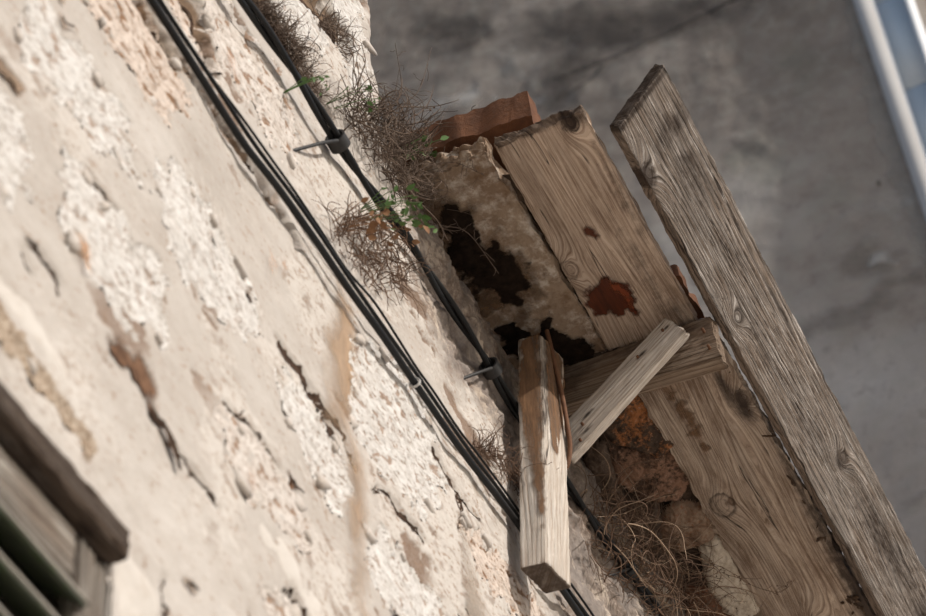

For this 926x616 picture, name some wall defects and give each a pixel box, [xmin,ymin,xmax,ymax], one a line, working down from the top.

spalling [0,87,37,212]
spalling [13,0,264,351]
peeling [0,300,98,461]
crack [149,407,217,508]
spalling [274,366,354,520]
spalling [348,333,448,523]
crack [160,579,200,616]
spalling [360,520,448,616]